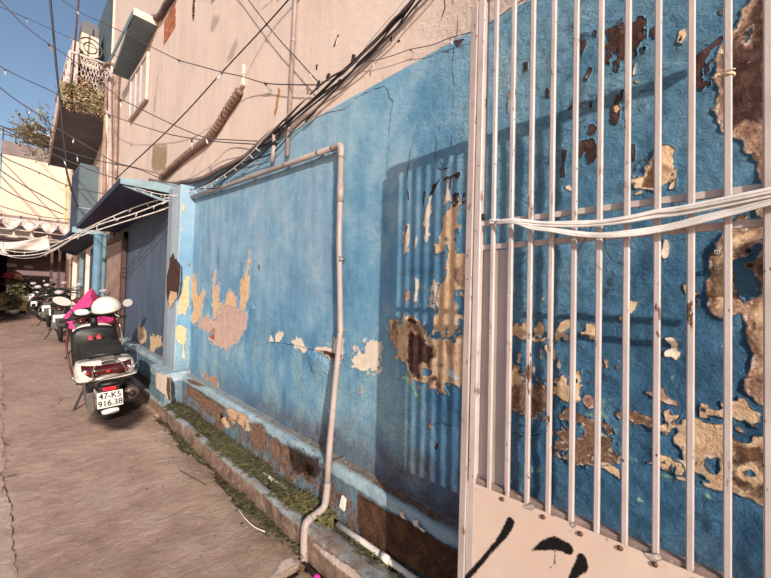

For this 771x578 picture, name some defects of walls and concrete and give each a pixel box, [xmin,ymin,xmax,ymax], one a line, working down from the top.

crack [318,86,393,127]
peeling [579,14,655,84]
flaking render [696,0,763,184]
peeling [631,143,679,196]
peeling [166,248,261,359]
peeling [269,171,466,397]
flaking render [155,372,171,402]
flaking render [186,368,293,469]
flaking render [511,208,763,508]
crack [2,473,18,578]